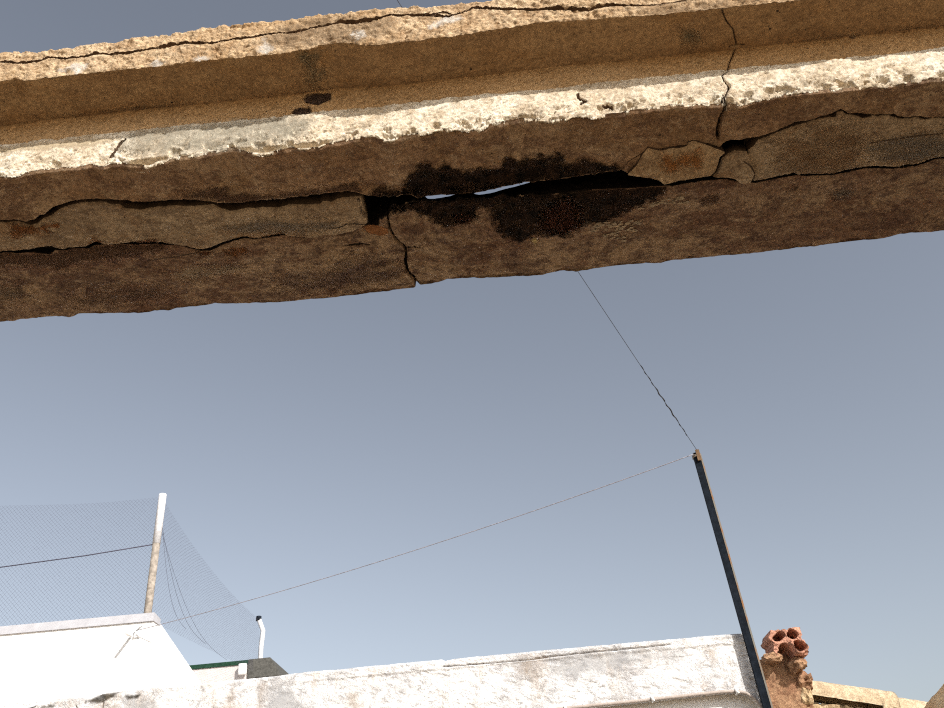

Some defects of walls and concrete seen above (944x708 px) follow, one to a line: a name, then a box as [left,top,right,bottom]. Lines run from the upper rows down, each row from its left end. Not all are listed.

crack [0,0,686,64]
crack [577,93,613,110]
crack [716,9,744,136]
crack [109,138,126,159]
crack [743,138,755,182]
crack [870,133,944,143]
leakage [372,152,666,243]
crack [328,203,420,277]